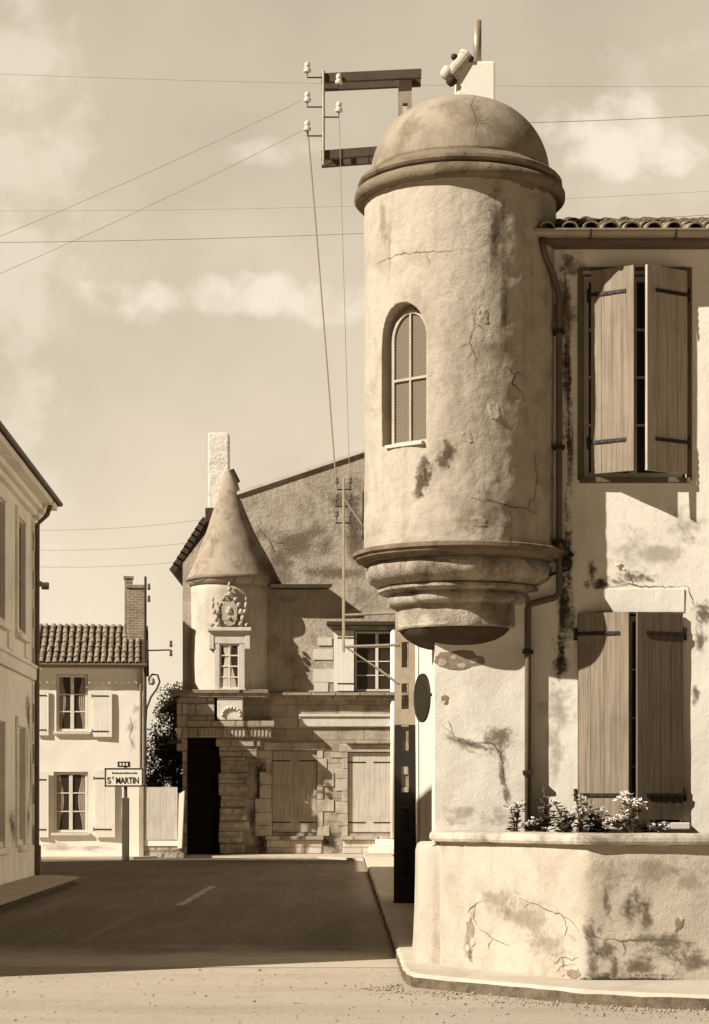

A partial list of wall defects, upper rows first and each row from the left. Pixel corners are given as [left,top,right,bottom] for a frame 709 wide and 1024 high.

damp [553,254,578,484]
damp [414,440,456,498]
crack [471,460,541,526]
damp [553,502,574,678]
flaking render [434,650,485,670]
damp [579,935,707,980]